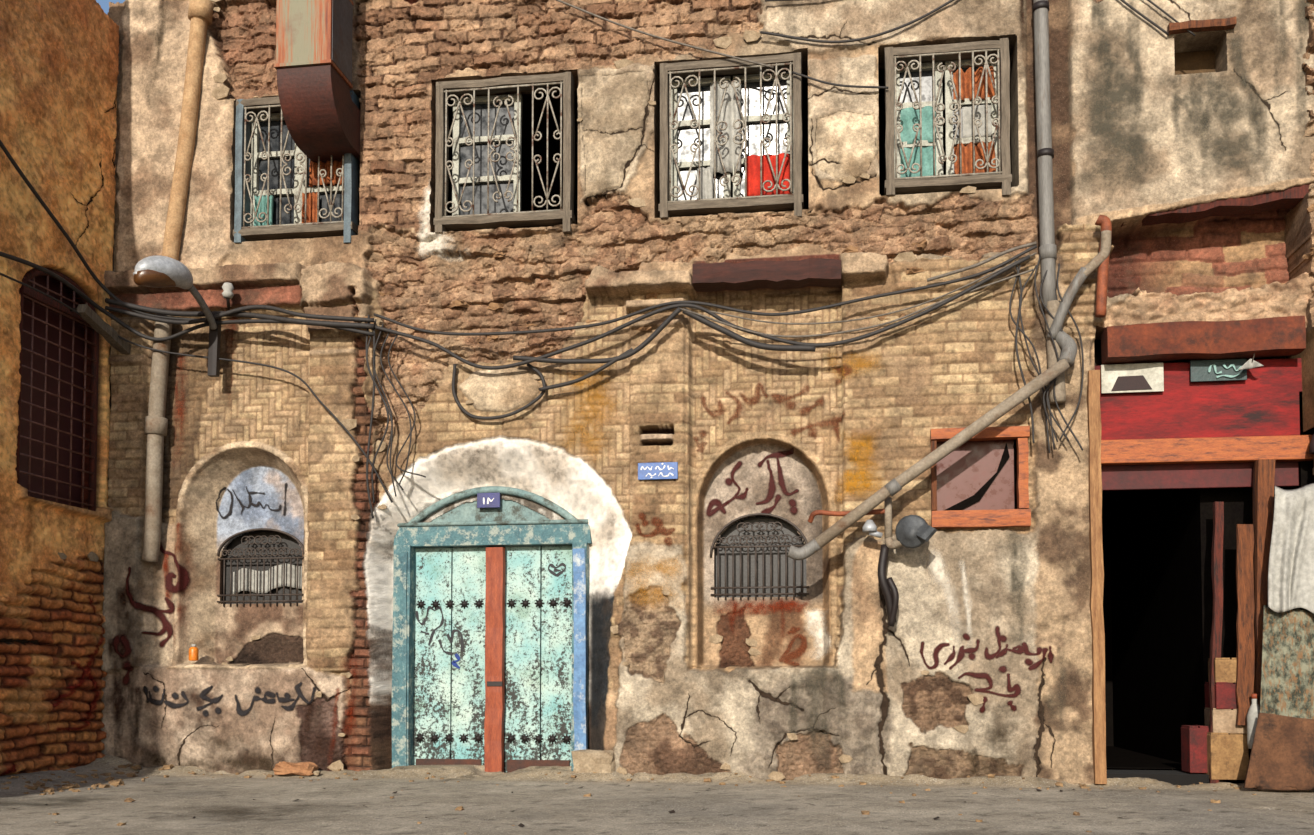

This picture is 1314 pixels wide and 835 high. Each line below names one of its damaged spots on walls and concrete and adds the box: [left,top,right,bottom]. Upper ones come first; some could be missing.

crack [583,69,655,206]
crack [808,86,877,190]
water stain [1087,0,1147,177]
water stain [1174,39,1260,168]
crack [1234,69,1287,150]
spalling [296,0,1039,781]
crack [679,680,839,766]
crack [866,584,910,775]